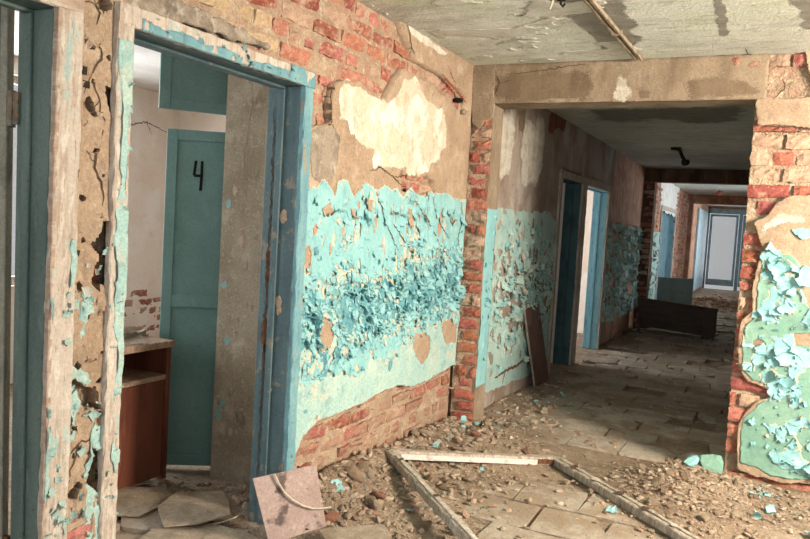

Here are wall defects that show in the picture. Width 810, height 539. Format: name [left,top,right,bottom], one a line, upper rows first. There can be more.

damp [562,0,643,49]
damp [713,0,730,36]
damp [788,0,810,30]
crack [84,46,104,226]
peeling [50,38,161,401]
peeling [142,0,556,469]
damp [494,69,761,188]
peeling [601,181,663,327]
spalling [747,108,810,215]
crack [765,125,810,139]
peeling [725,233,810,492]
peeling [43,363,120,539]